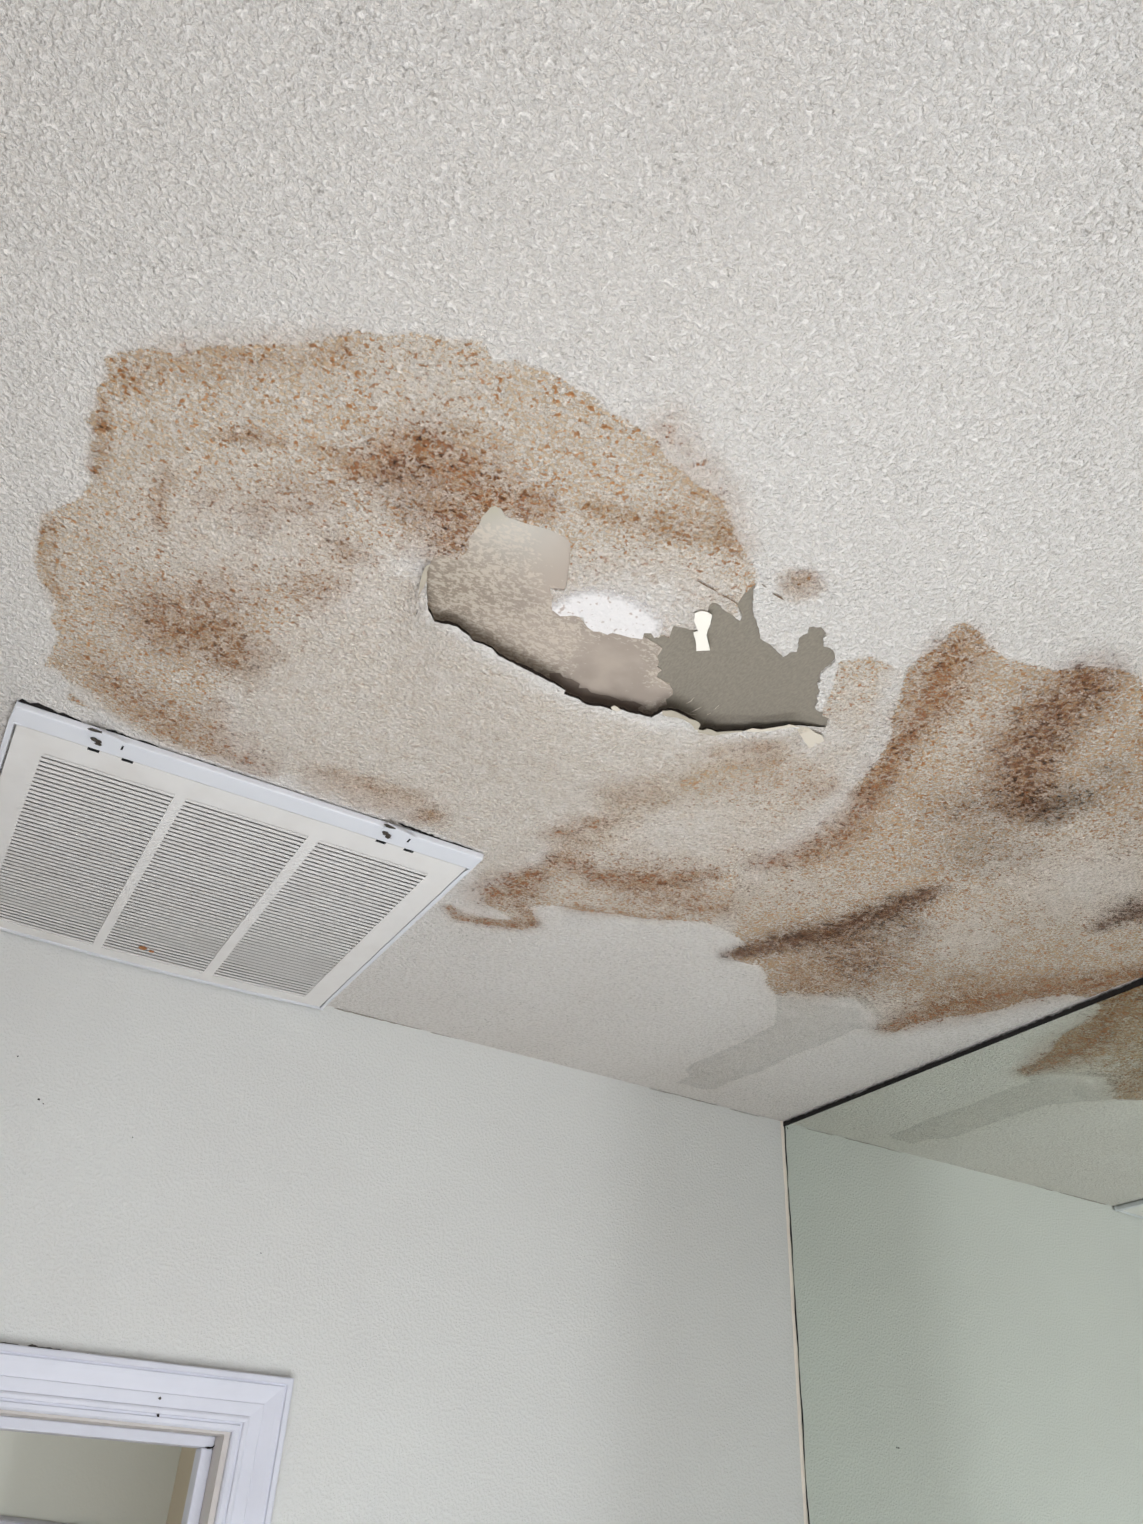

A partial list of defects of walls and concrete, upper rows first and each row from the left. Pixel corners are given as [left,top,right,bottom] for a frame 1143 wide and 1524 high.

leakage [34,331,755,774]
peeling [418,505,835,748]
leakage [443,623,1143,1033]